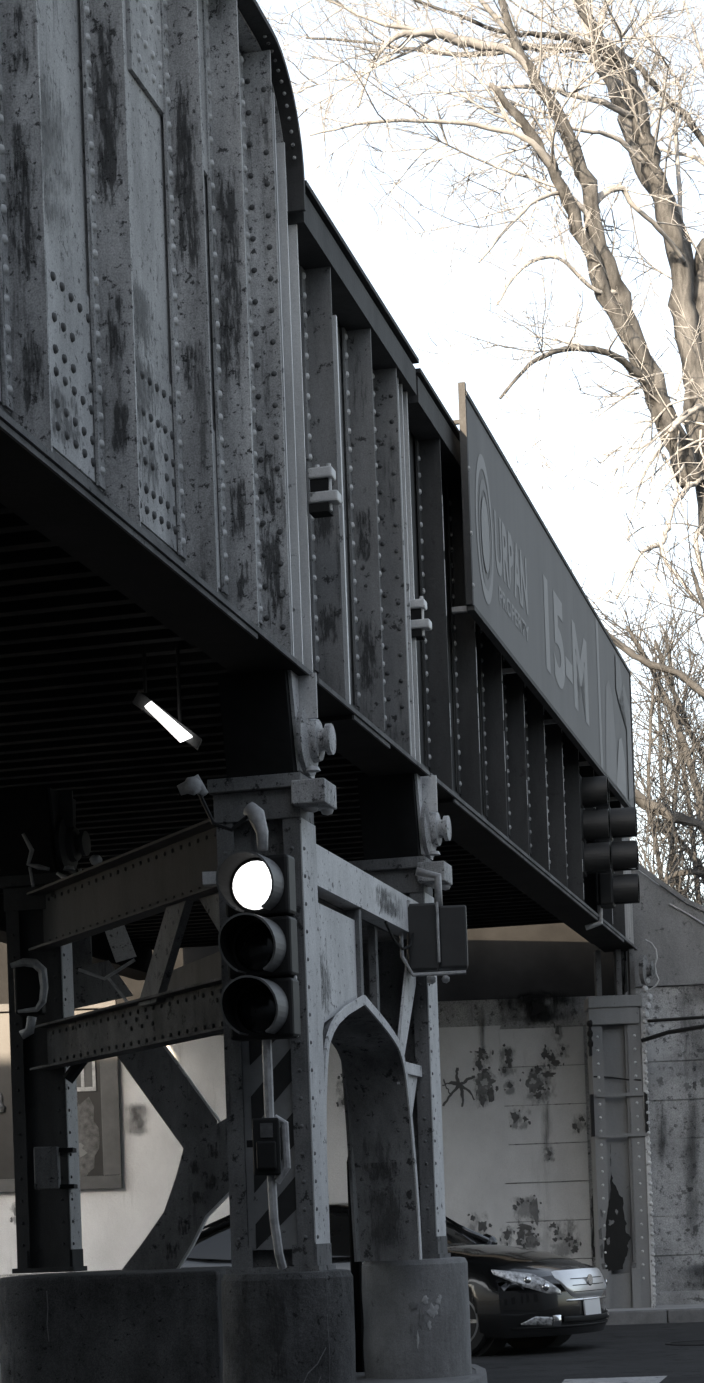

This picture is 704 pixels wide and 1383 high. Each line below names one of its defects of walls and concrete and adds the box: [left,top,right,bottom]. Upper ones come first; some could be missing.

rust [14,6,29,73]
rust [7,122,39,281]
rust [93,25,121,203]
rust [174,80,200,268]
rust [217,169,242,381]
rust [20,334,44,412]
rust [105,282,162,495]
rust [181,345,200,389]
rust [230,450,285,627]
rust [356,509,371,561]
rust [359,622,378,694]